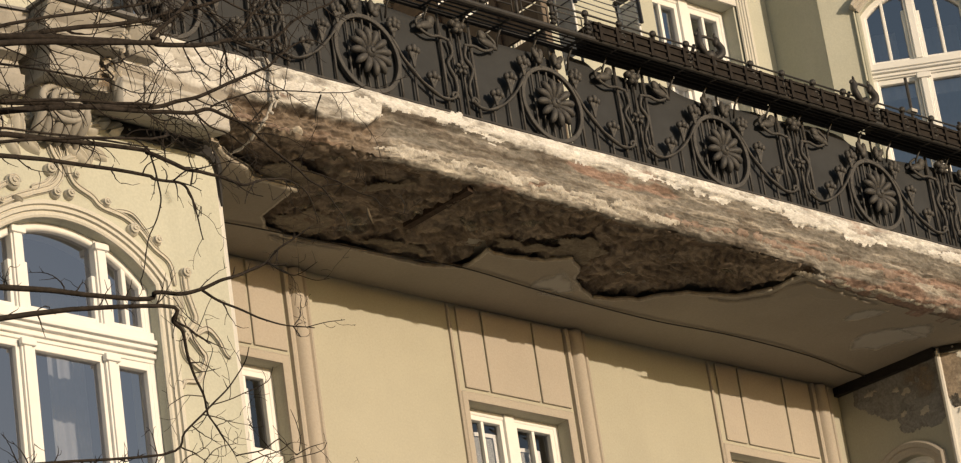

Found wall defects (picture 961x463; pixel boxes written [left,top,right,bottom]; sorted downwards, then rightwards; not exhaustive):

crack [119,30,131,60]
flaking render [146,50,914,249]
flaking render [218,112,961,313]
flaking render [853,351,961,433]